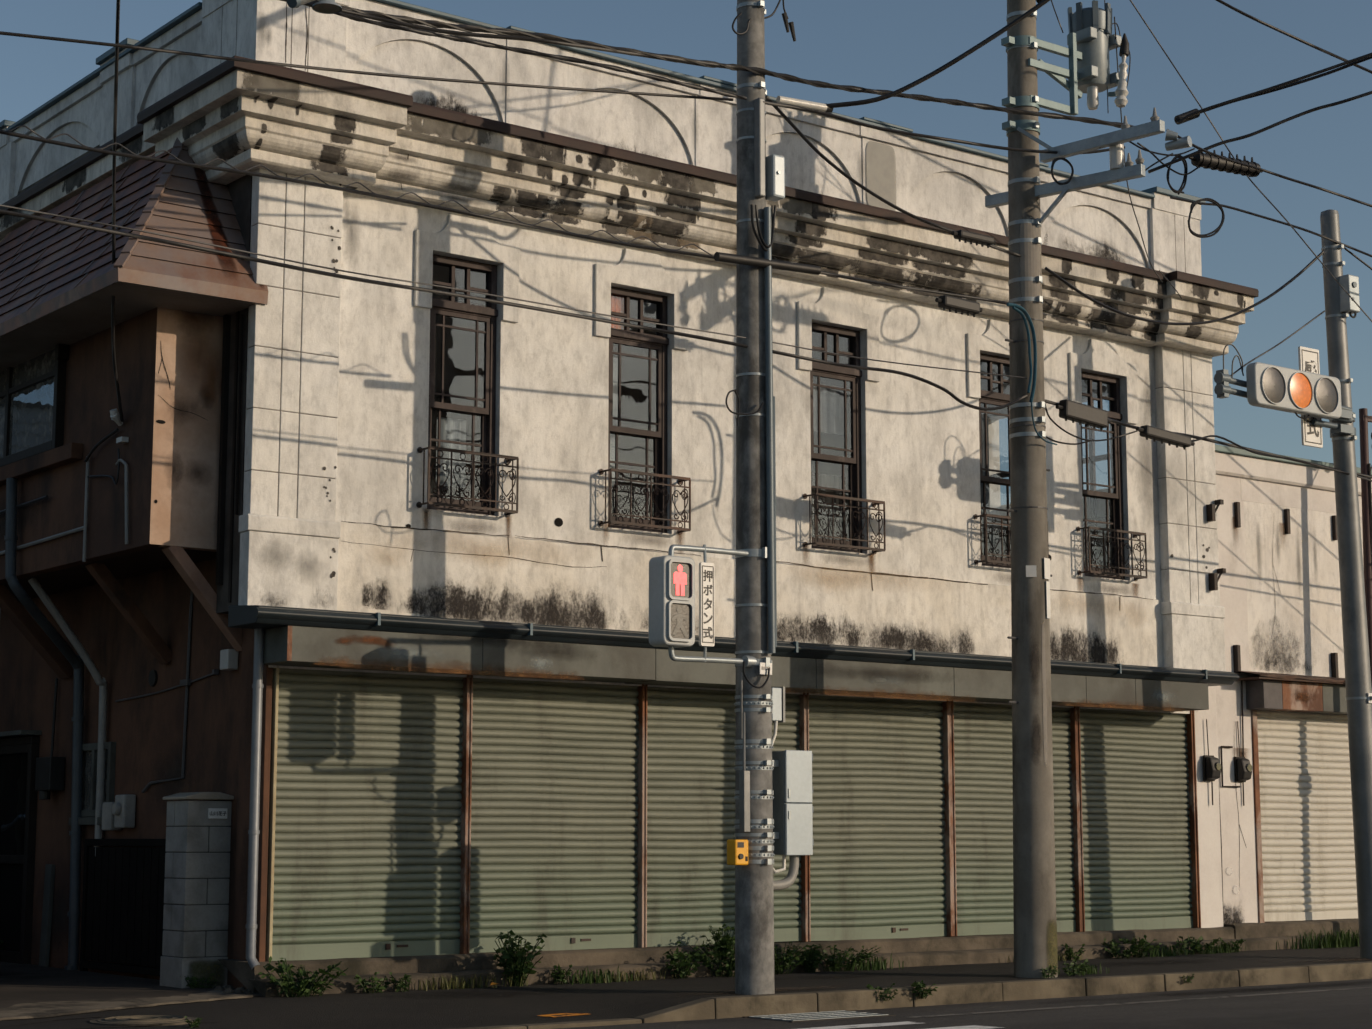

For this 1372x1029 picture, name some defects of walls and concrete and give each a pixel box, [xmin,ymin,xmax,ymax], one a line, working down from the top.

peeling [490,138,701,249]
peeling [767,197,982,302]
peeling [1042,259,1167,342]
peeling [1185,284,1219,339]
leakage [407,585,606,629]
corrosion [338,636,391,646]
leakage [777,616,974,654]
leakage [1050,631,1117,663]